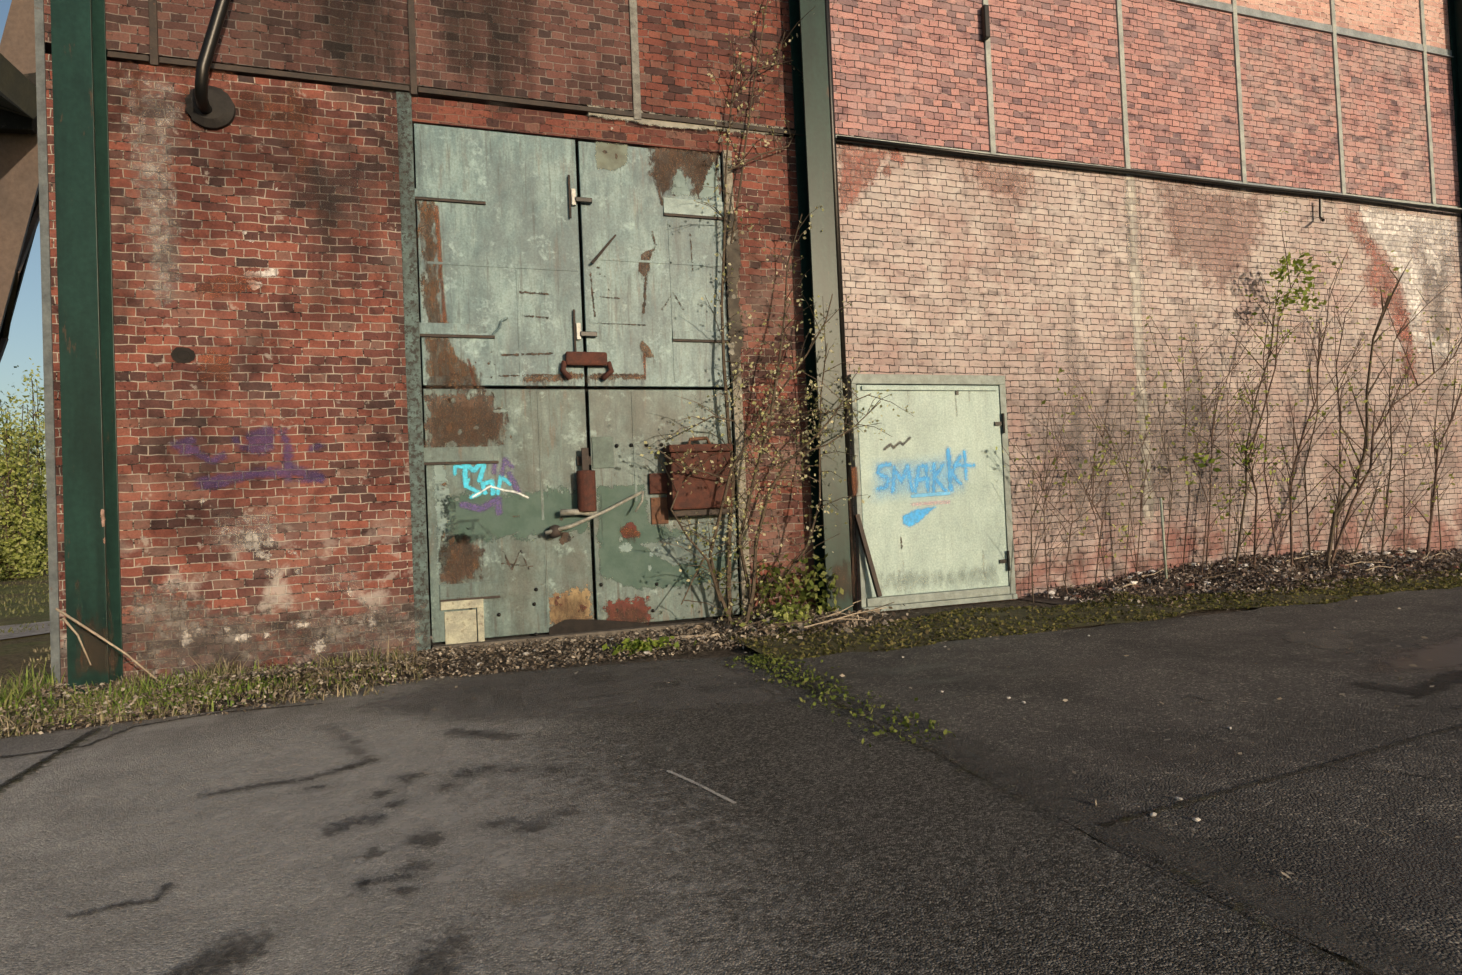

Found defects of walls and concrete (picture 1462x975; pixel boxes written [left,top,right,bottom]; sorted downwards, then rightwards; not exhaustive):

peeling [595,107,628,171]
corrosion [416,200,482,392]
peeling [590,231,685,379]
peeling [648,137,745,401]
corrosion [549,584,652,635]